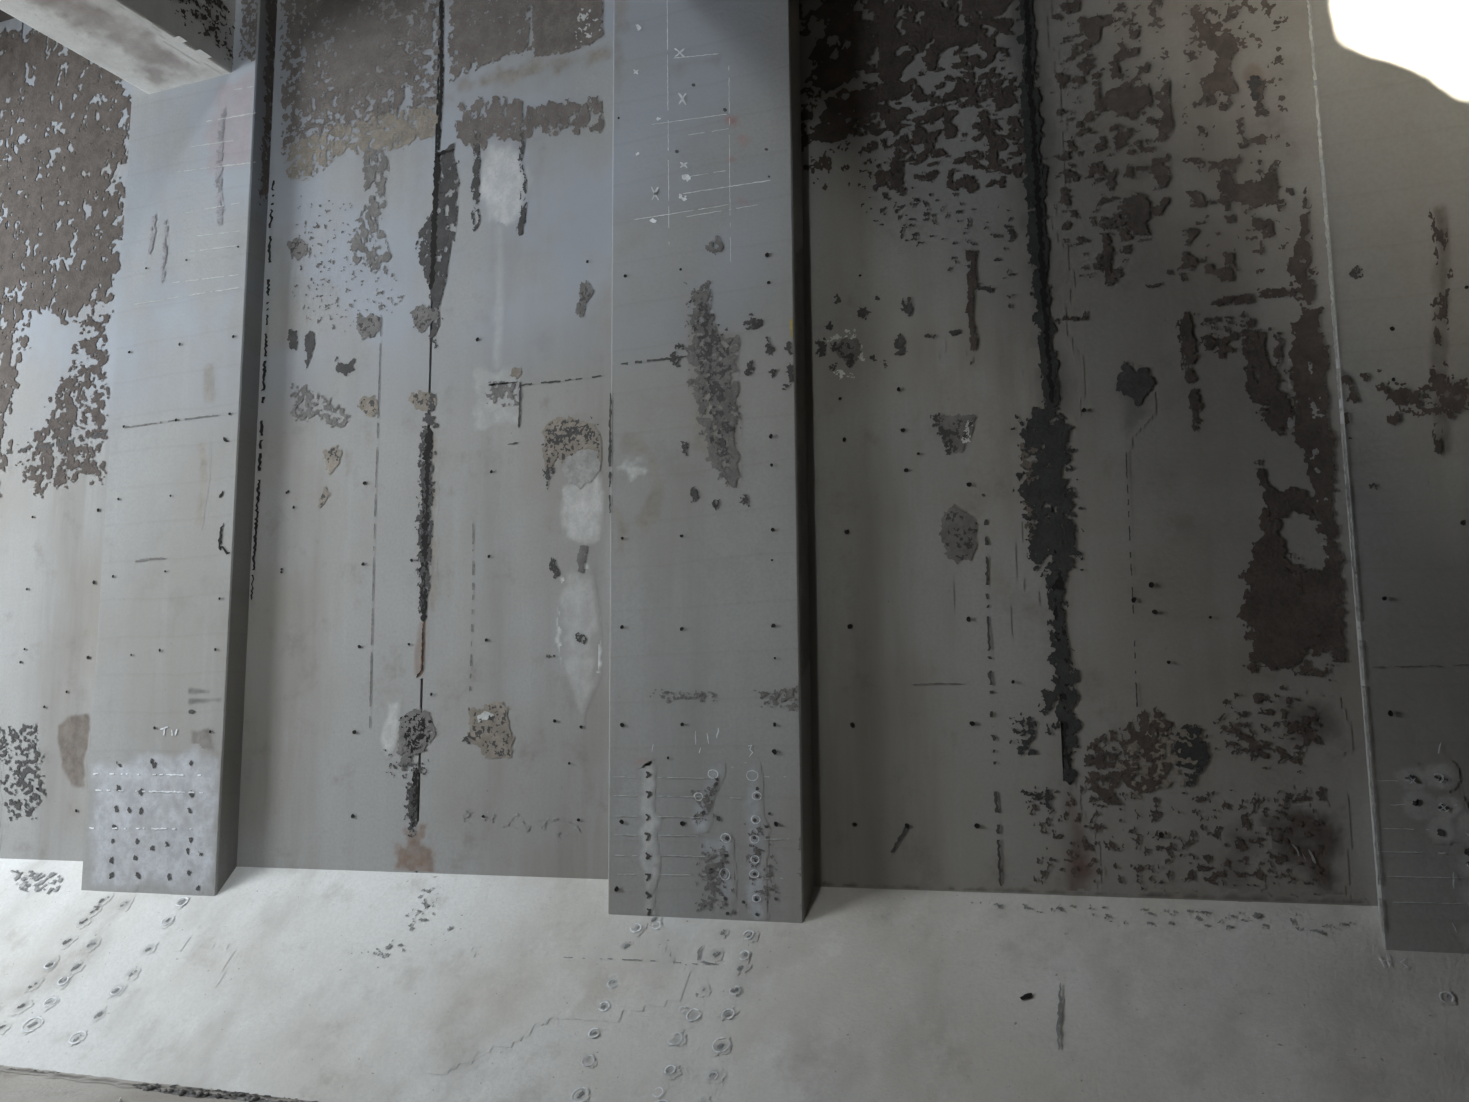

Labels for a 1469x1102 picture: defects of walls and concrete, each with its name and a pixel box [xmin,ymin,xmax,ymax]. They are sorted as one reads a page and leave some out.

crack [428,0,454,290]
water stain [281,39,613,445]
water stain [994,0,1085,579]
water stain [1425,201,1460,460]
water stain [611,427,669,562]
water stain [0,711,92,848]
water stain [546,545,603,727]
water stain [1009,710,1042,756]
water stain [1266,690,1353,756]
water stain [11,870,63,895]